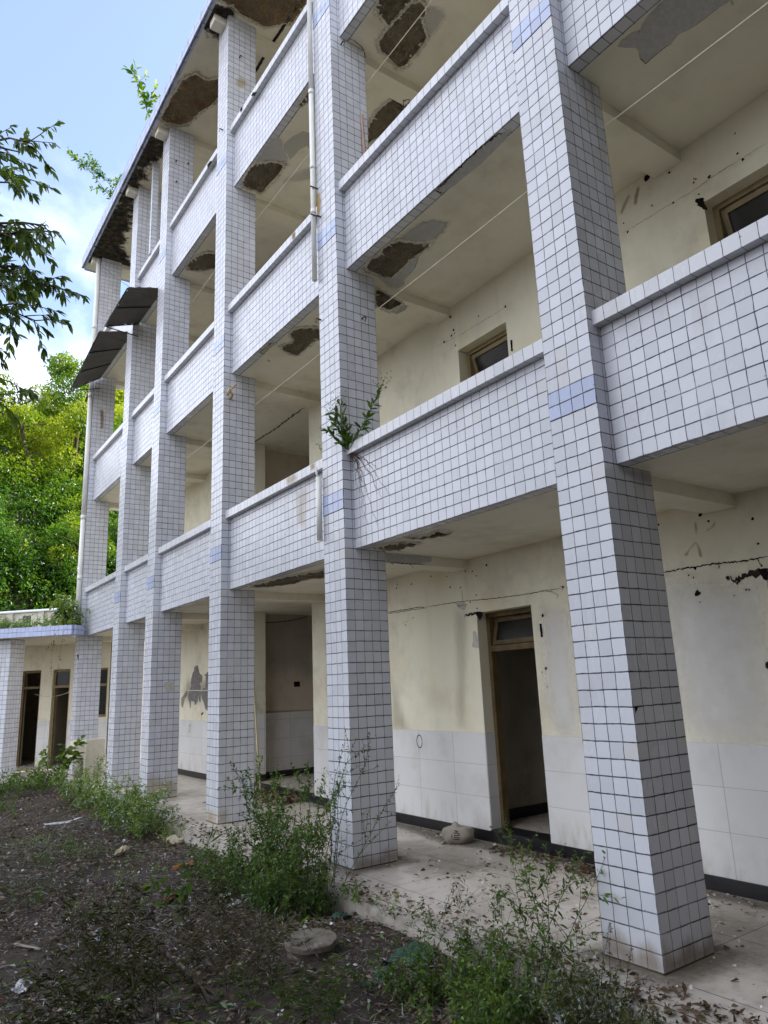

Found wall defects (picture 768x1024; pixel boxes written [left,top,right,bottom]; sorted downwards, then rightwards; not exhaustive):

spalling [219,0,307,30]
spalling [373,0,429,69]
spalling [160,71,218,127]
spalling [367,98,405,144]
spalling [240,137,288,193]
spalling [185,251,215,272]
spalling [364,239,433,314]
spalling [259,326,320,362]
crack [255,408,304,442]
spalling [247,569,325,588]
crack [664,556,768,585]
crack [388,586,564,616]